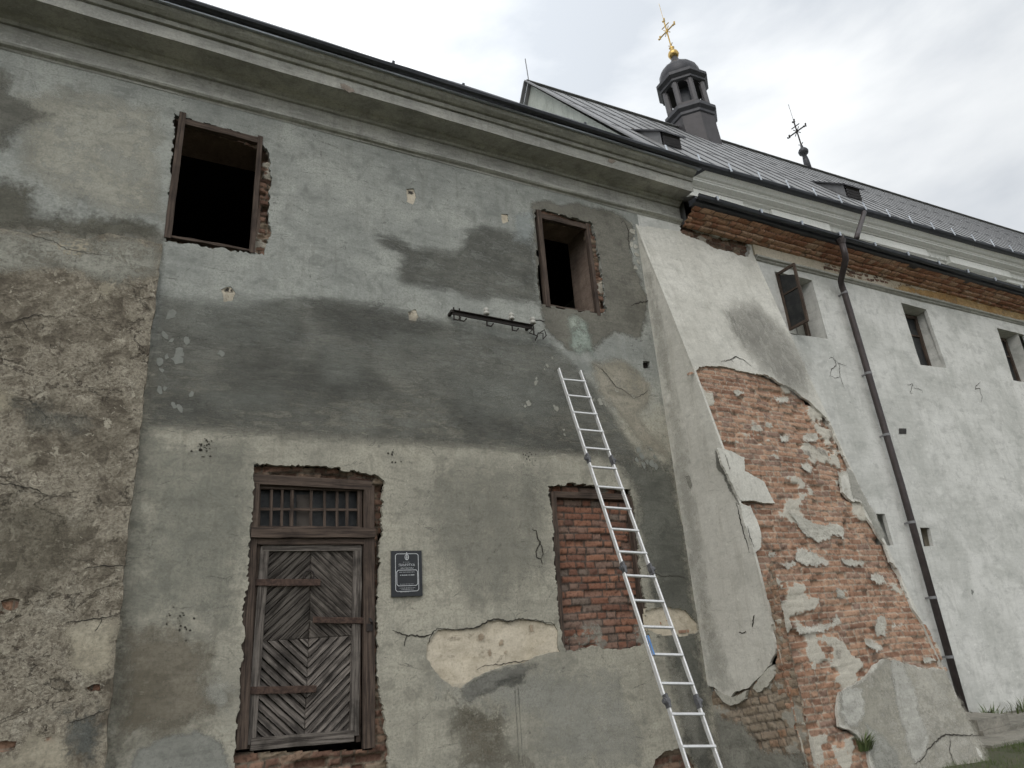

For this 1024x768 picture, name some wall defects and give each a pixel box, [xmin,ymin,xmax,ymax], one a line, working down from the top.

damp [0,183,157,238]
damp [382,214,537,301]
flaking render [680,223,747,257]
damp [149,300,696,620]
crack [532,529,544,565]
flaking render [687,367,948,768]
flaking render [66,619,118,691]
spalling [233,465,388,768]
crack [392,630,434,646]
flaking render [426,618,559,688]
damp [659,633,713,768]
flaking render [0,731,70,768]